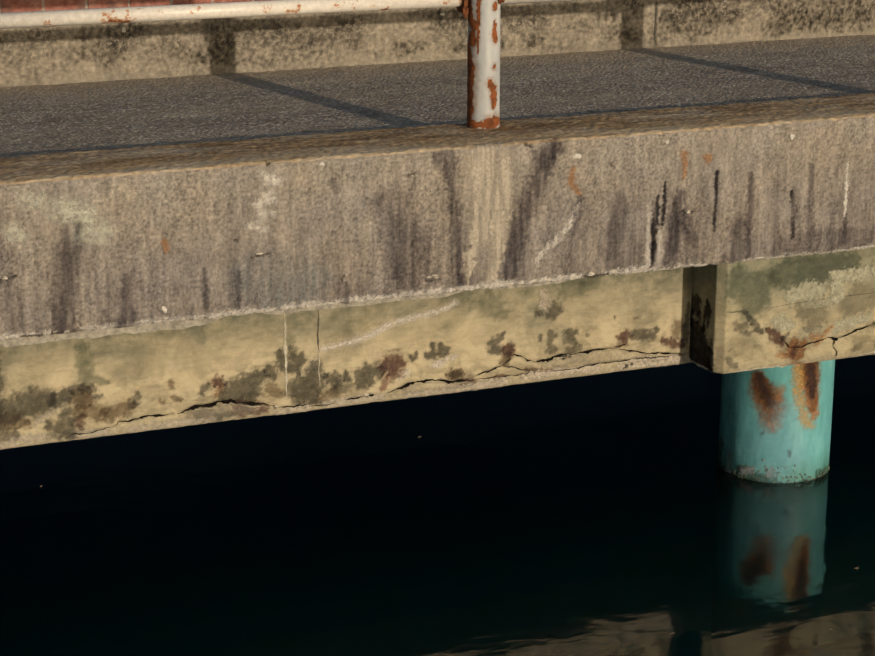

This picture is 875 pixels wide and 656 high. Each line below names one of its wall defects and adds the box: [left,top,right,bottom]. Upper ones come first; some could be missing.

rust [467,0,500,129]
leakage [171,143,589,321]
leakage [603,182,735,275]
leakage [617,307,711,370]
crack [782,323,875,357]
leakage [129,416,215,433]
leakage [274,404,312,415]
leakage [322,373,396,408]
crack [66,340,684,438]
leakage [403,377,510,398]
rust [752,371,784,432]
rust [786,334,819,427]